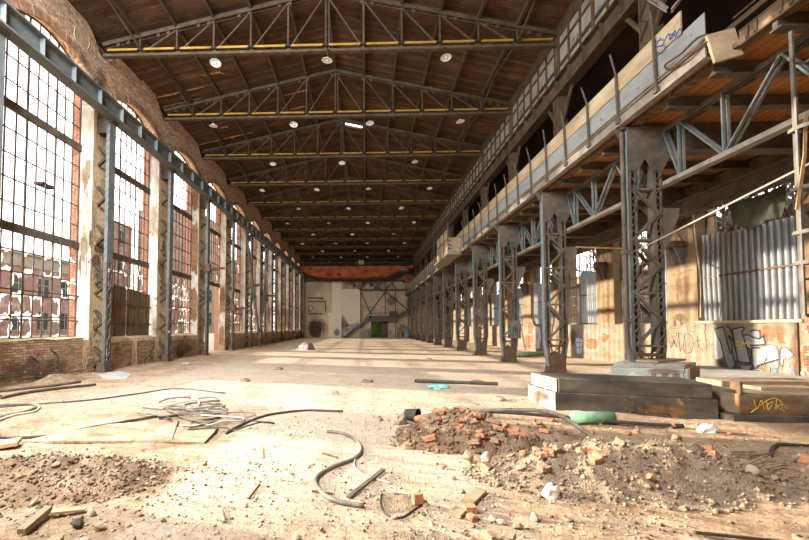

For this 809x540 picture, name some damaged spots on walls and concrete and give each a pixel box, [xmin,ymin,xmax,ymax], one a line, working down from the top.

spalling [801,344,809,376]